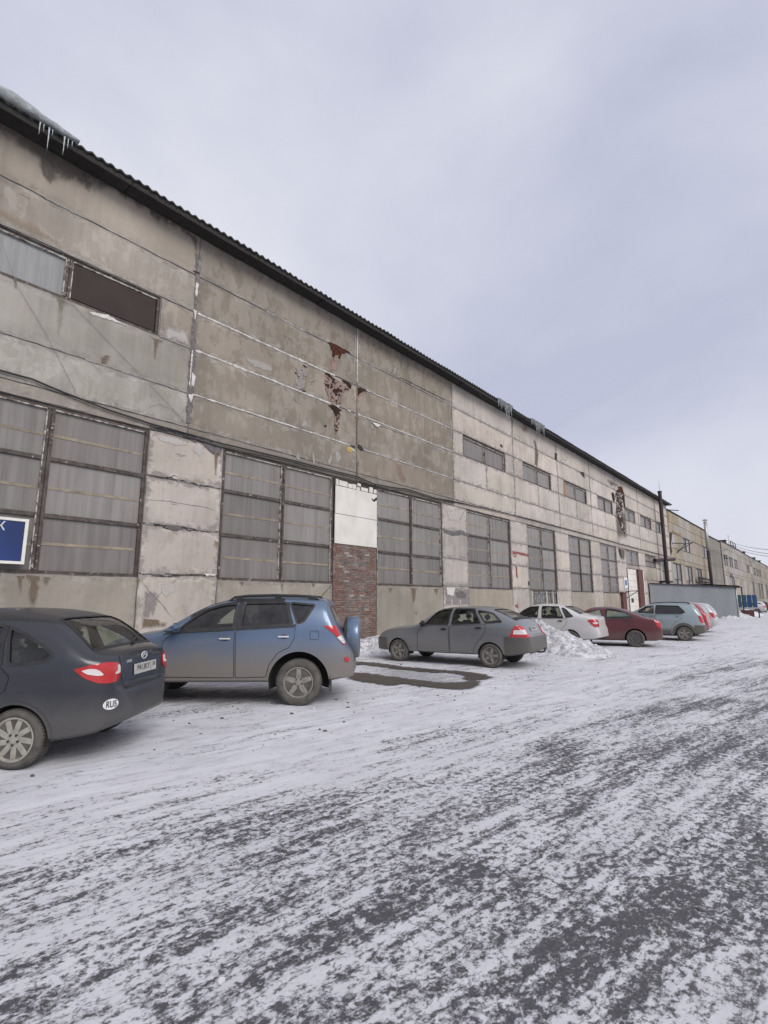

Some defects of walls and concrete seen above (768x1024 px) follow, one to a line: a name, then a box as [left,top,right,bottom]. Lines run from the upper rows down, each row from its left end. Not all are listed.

spalling [324,342,366,435]
spalling [611,486,626,559]